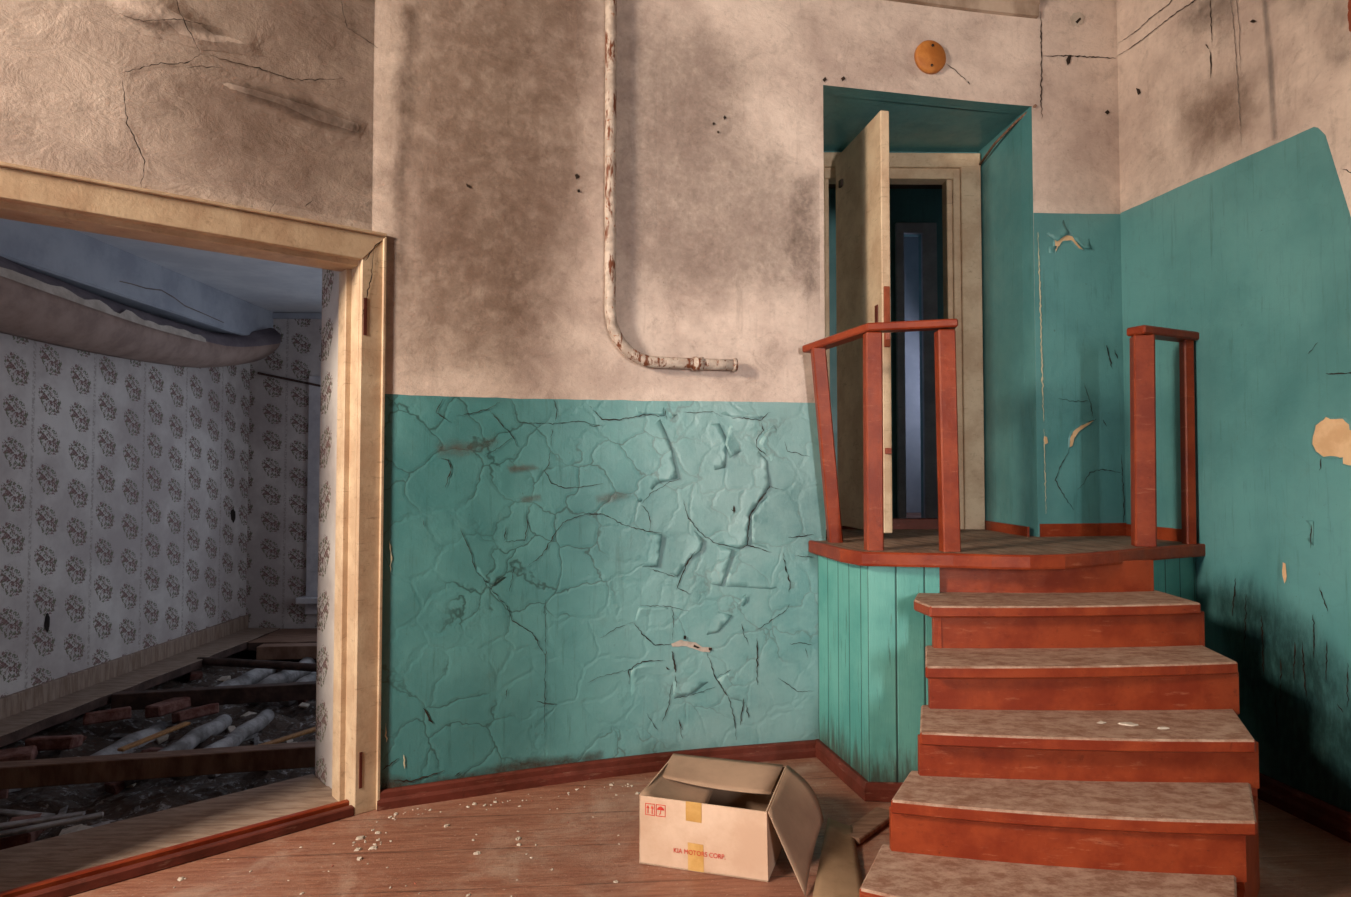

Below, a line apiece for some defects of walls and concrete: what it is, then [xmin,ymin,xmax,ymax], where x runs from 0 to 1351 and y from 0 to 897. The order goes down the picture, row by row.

crack [120,0,335,181]
crack [1040,0,1241,133]
peeling [1046,220,1092,254]
peeling [1311,415,1351,468]
crack [436,401,813,738]